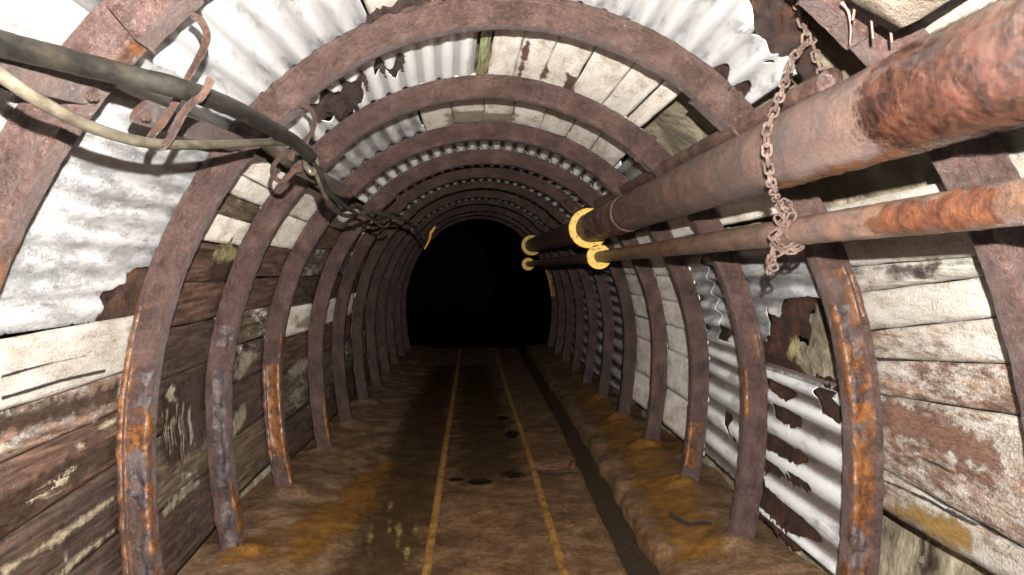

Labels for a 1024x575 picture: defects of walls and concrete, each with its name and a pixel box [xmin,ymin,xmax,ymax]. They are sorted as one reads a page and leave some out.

corrosion [864,185,1004,236]
corrosion [115,309,160,575]
corrosion [262,333,294,484]
corrosion [683,421,700,469]
corrosion [829,266,973,575]
peeling [881,396,1004,492]